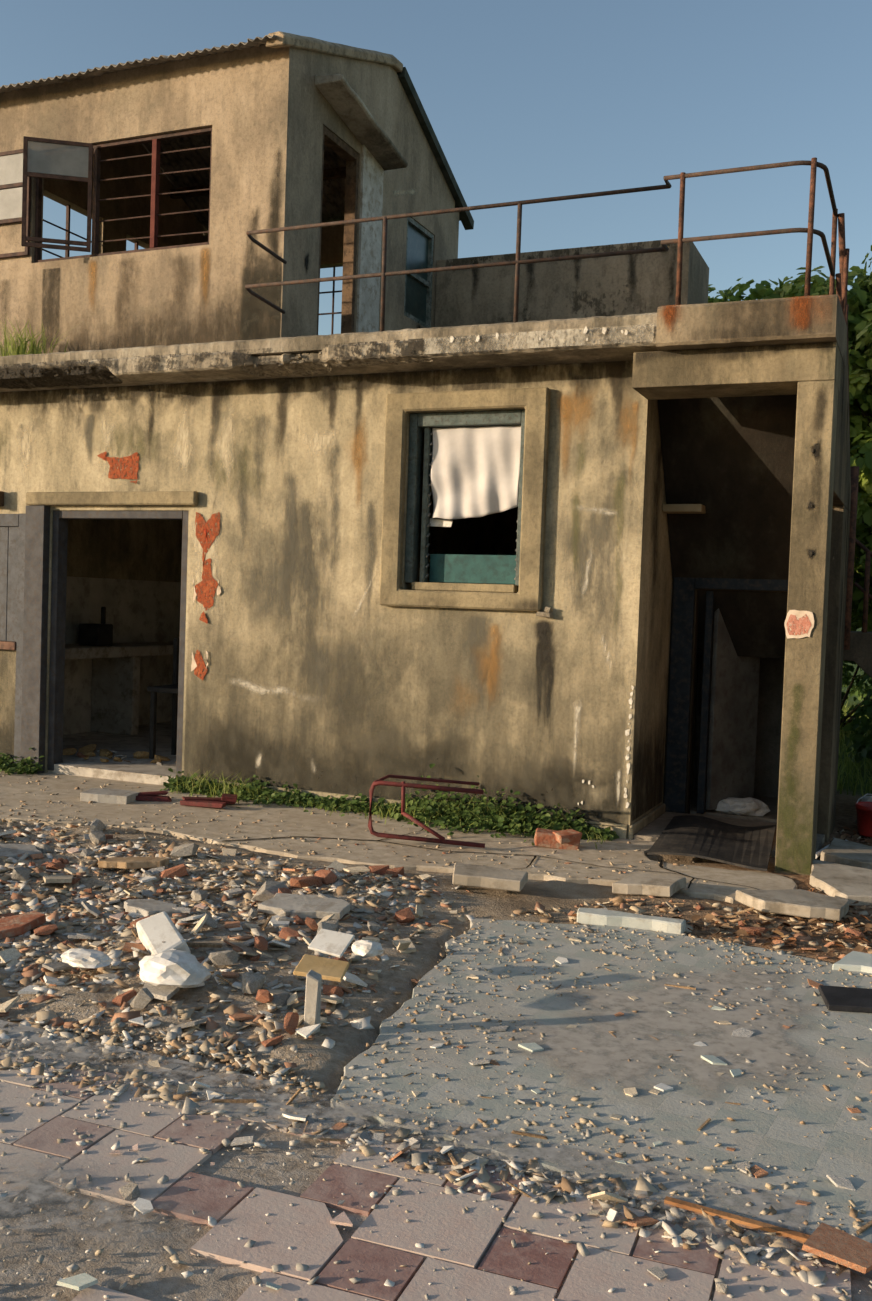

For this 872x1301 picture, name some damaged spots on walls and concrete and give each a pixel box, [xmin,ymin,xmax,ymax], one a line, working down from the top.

water stain [0,193,833,458]
corrosion [662,305,676,327]
corrosion [790,296,811,326]
water stain [210,440,259,536]
water stain [249,477,337,614]
water stain [360,505,375,605]
water stain [567,478,624,618]
water stain [524,602,554,720]